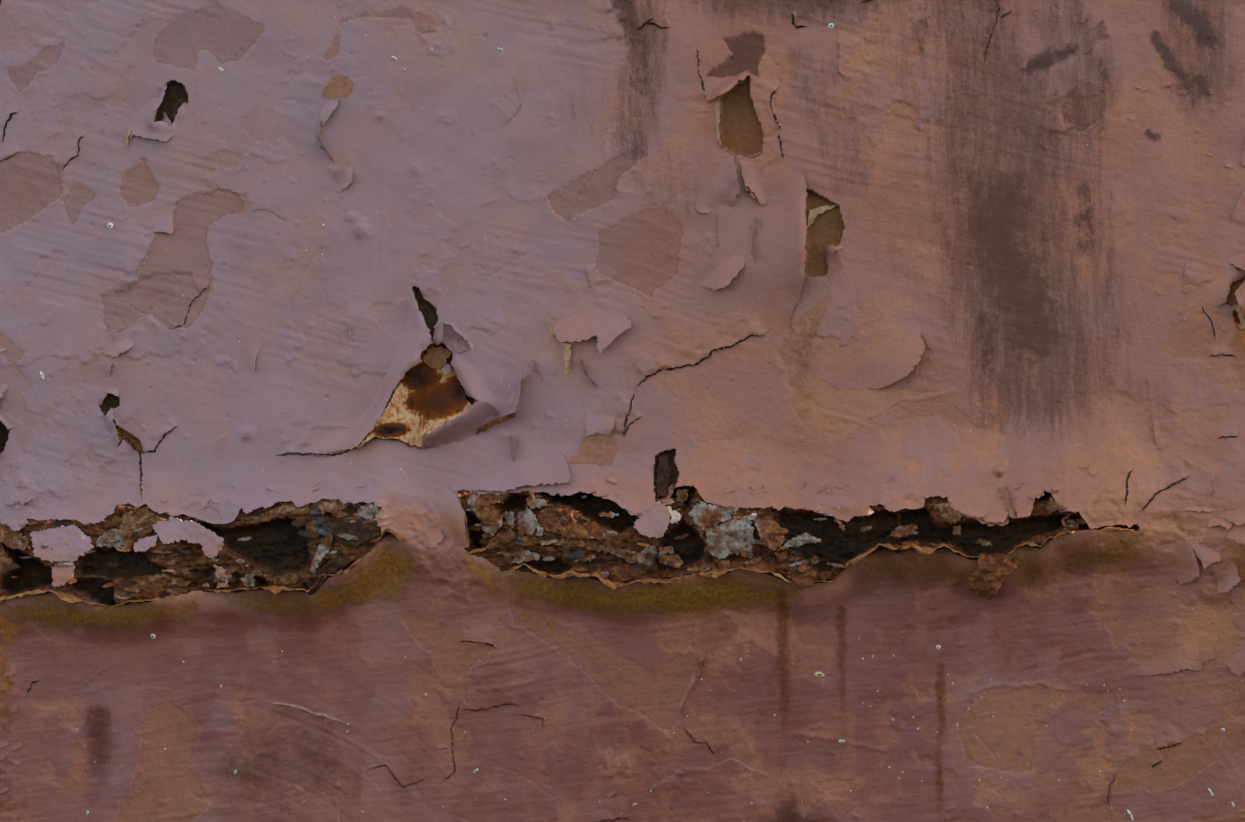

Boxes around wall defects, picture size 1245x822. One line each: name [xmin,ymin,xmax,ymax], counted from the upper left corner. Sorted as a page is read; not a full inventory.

peeling [125,3,264,148]
leakage [1022,43,1079,75]
leakage [1150,31,1209,103]
leakage [1168,0,1219,48]
peeling [686,33,925,389]
leakage [955,168,1070,380]
peeling [311,285,533,455]
peeling [544,309,631,388]
crack [623,329,770,437]
crack [112,408,177,496]
spalling [0,490,409,608]
spalling [448,397,1139,602]